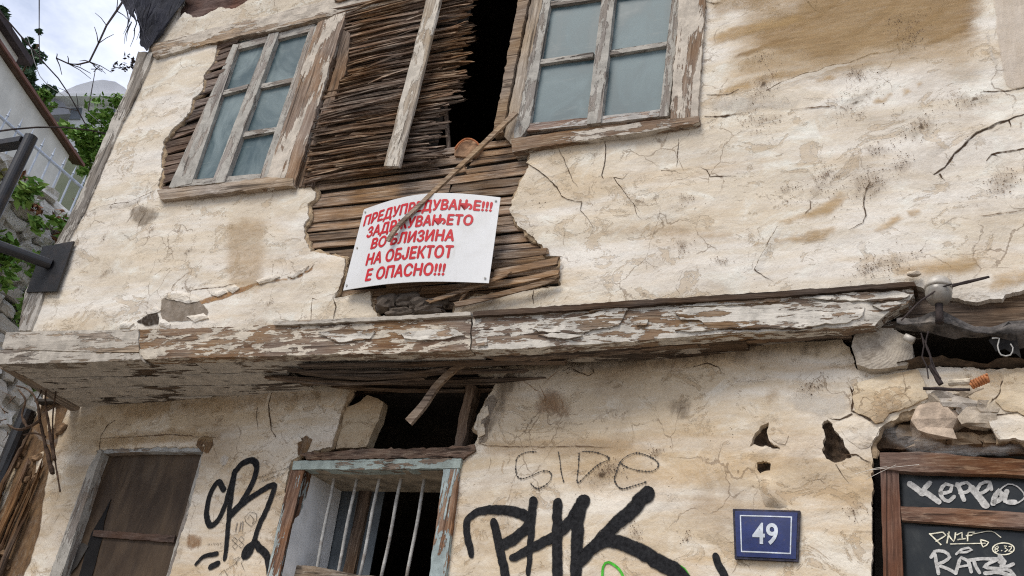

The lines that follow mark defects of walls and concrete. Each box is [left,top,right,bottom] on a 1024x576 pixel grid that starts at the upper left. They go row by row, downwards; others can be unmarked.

crack [766,50,893,110]
damp [717,0,974,136]
crack [929,87,1024,179]
crack [526,141,640,227]
crack [849,182,873,230]
crack [754,226,783,281]
spalling [119,266,312,329]
peeling [532,308,649,339]
peeling [675,291,910,333]
spalling [754,427,778,449]
peeling [823,369,928,463]
peeling [988,372,1024,443]